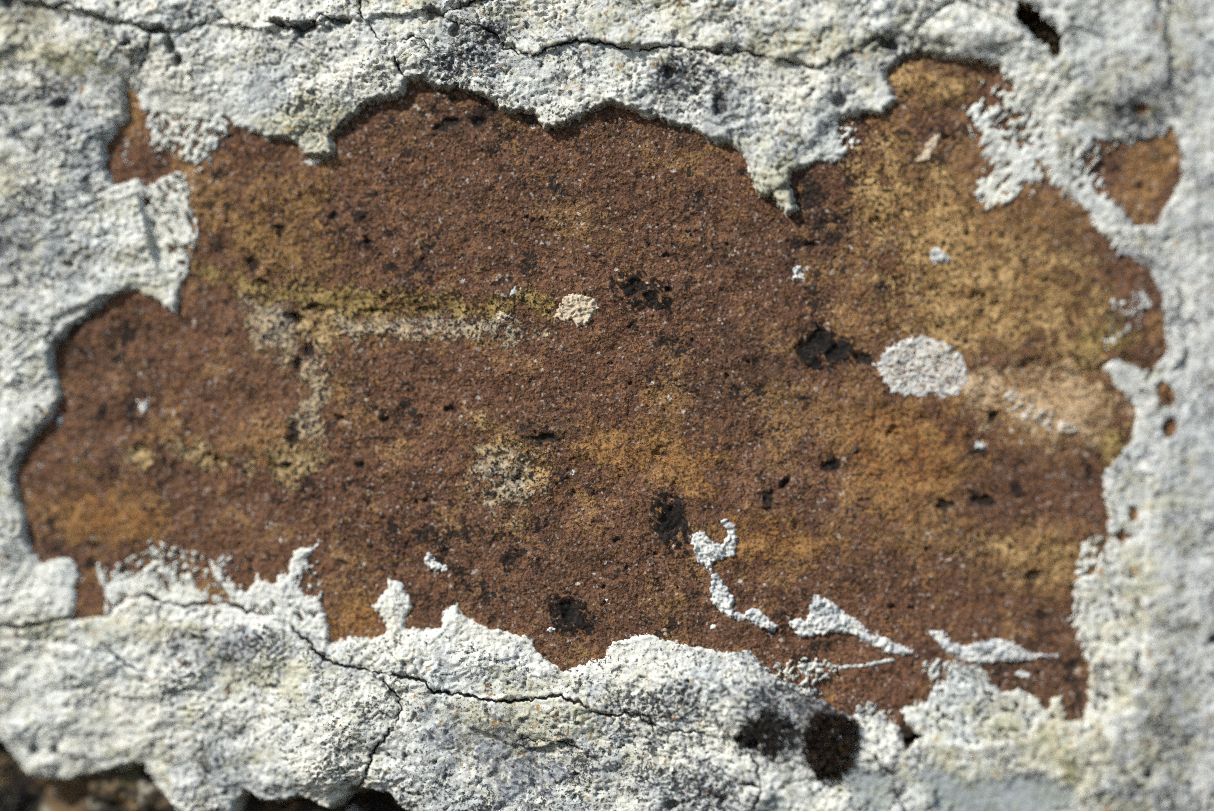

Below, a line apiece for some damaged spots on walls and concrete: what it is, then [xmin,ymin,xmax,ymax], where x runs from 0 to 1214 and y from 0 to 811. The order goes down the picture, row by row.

crack [6,0,1014,82]
spalling [15,52,1168,726]
spalling [1155,381,1177,406]
spalling [1162,417,1178,439]
crack [0,593,762,811]
spalling [0,743,178,811]
spalling [242,789,407,811]
crack [858,747,906,811]